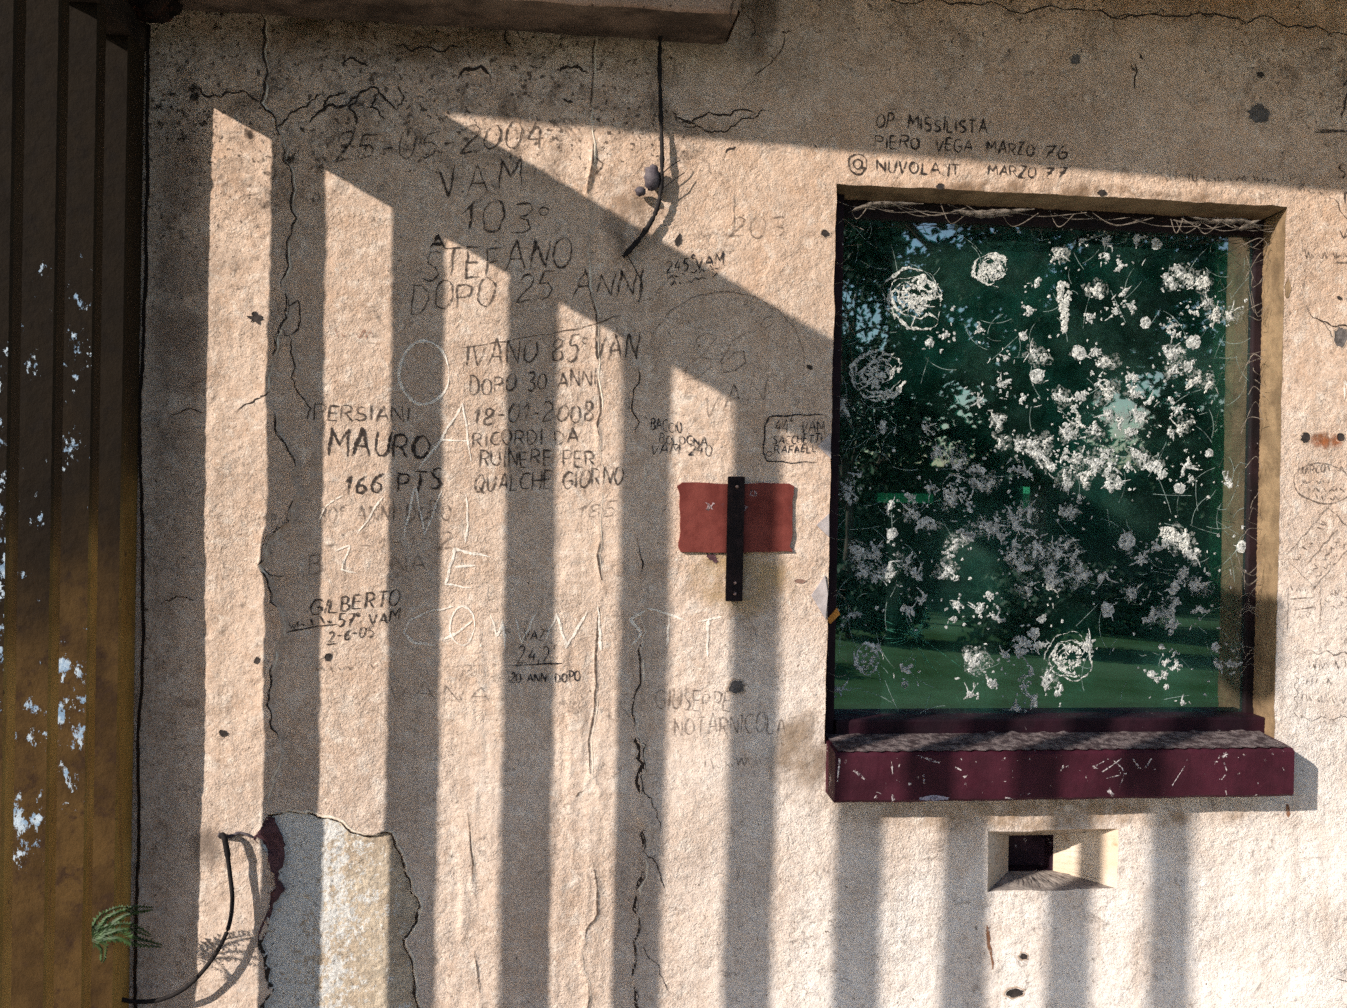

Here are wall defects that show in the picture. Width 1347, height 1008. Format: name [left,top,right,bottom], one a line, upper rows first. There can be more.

crack [556,37,603,192]
crack [893,0,1347,35]
crack [1130,54,1143,88]
crack [1308,310,1347,337]
crack [133,13,490,1008]
crack [462,243,641,797]
rust [1313,434,1339,448]
crack [630,619,667,1008]
spalling [253,809,424,1008]
crack [582,862,598,1008]